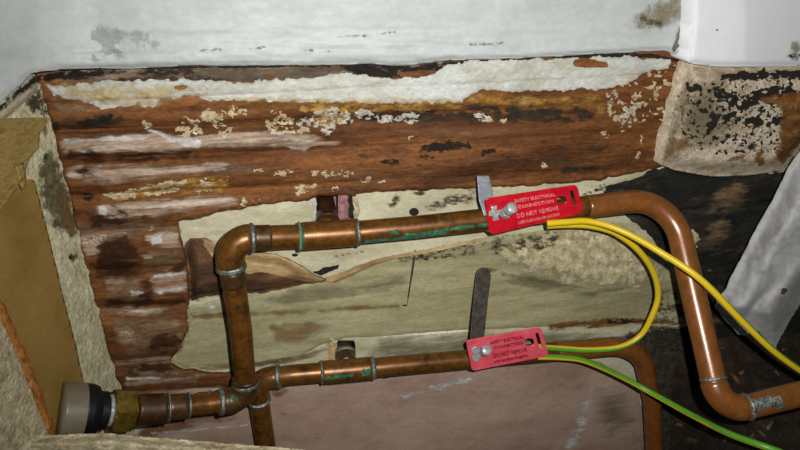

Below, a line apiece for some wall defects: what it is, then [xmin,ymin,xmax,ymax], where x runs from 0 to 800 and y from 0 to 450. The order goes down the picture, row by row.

water stain [638,0,681,28]
water stain [0,61,449,135]
rust [227,93,604,126]
water stain [337,99,595,125]
mould [672,68,800,159]
mould [39,151,78,237]
flaking render [34,50,678,395]
rust [549,318,678,330]